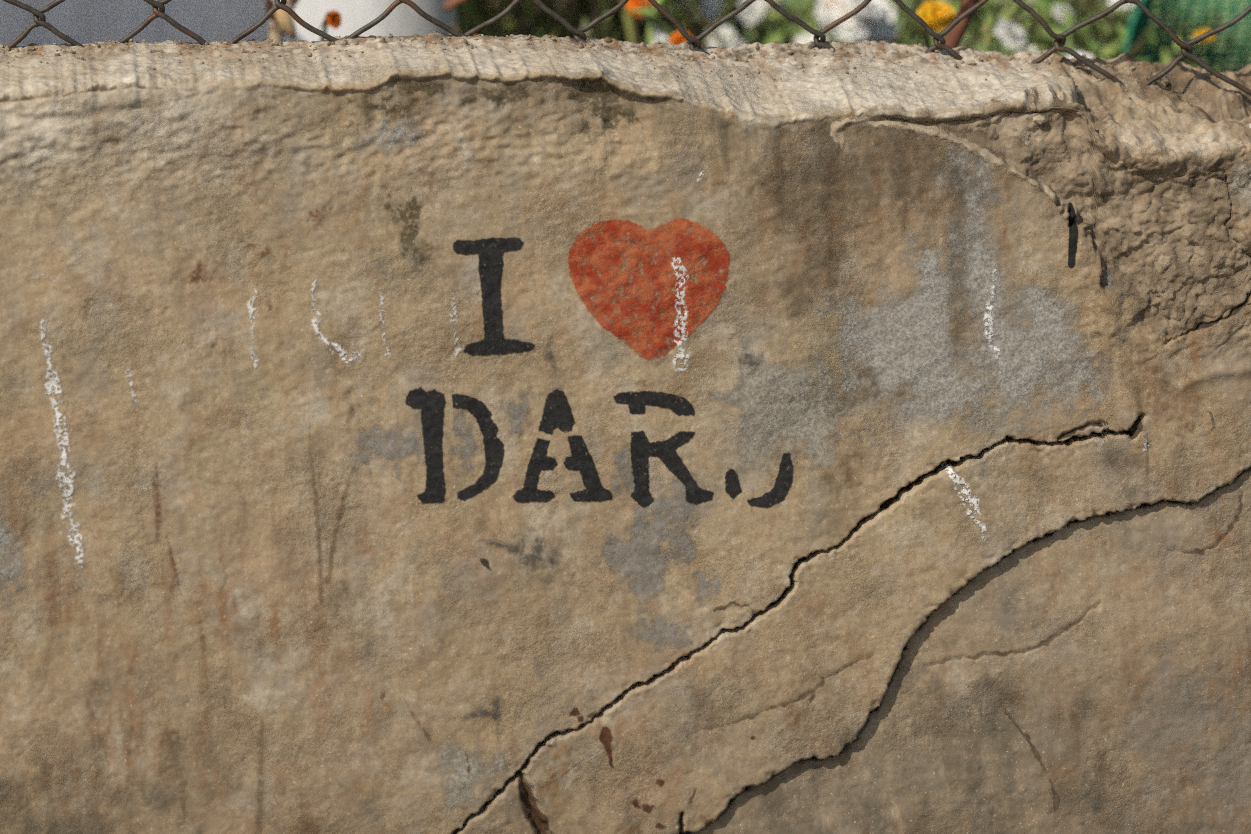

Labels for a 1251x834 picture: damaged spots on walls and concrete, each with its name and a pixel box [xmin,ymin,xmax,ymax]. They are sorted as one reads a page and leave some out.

spalling [711,81,1251,476]
crack [713,550,817,630]
crack [853,416,1143,529]
crack [955,467,1250,594]
crack [710,602,1099,760]
crack [679,790,695,834]